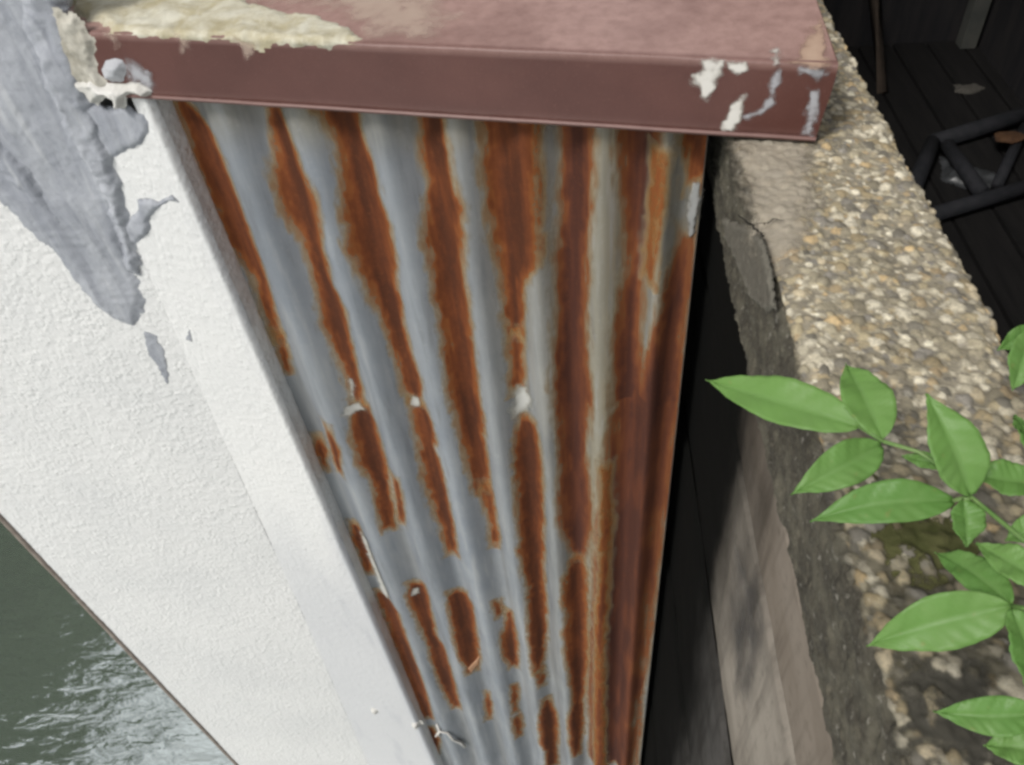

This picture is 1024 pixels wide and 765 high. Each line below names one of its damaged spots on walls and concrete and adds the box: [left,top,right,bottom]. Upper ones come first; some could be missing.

corrosion [172,101,294,376]
corrosion [266,107,406,534]
corrosion [348,519,376,575]
corrosion [308,109,460,559]
corrosion [372,579,482,755]
corrosion [416,117,501,549]
corrosion [475,120,707,765]
crack [738,215,782,254]